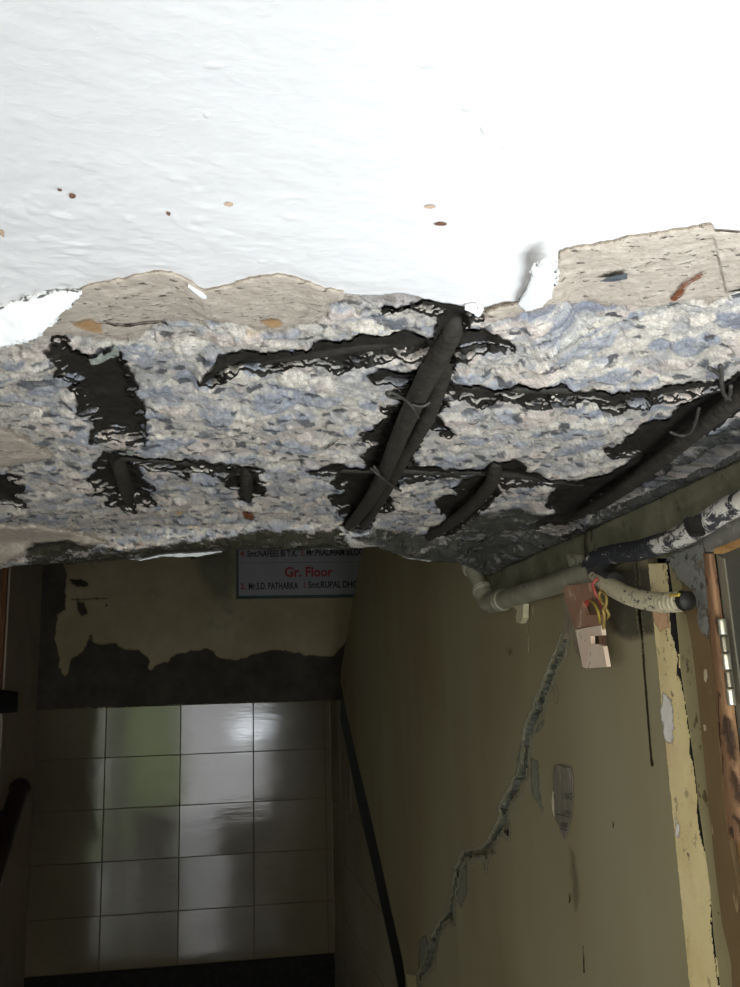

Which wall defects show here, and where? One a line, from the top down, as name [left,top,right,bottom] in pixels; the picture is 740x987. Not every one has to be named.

spalling [0,222,740,710]
crack [412,633,570,987]
peeling [660,693,674,743]